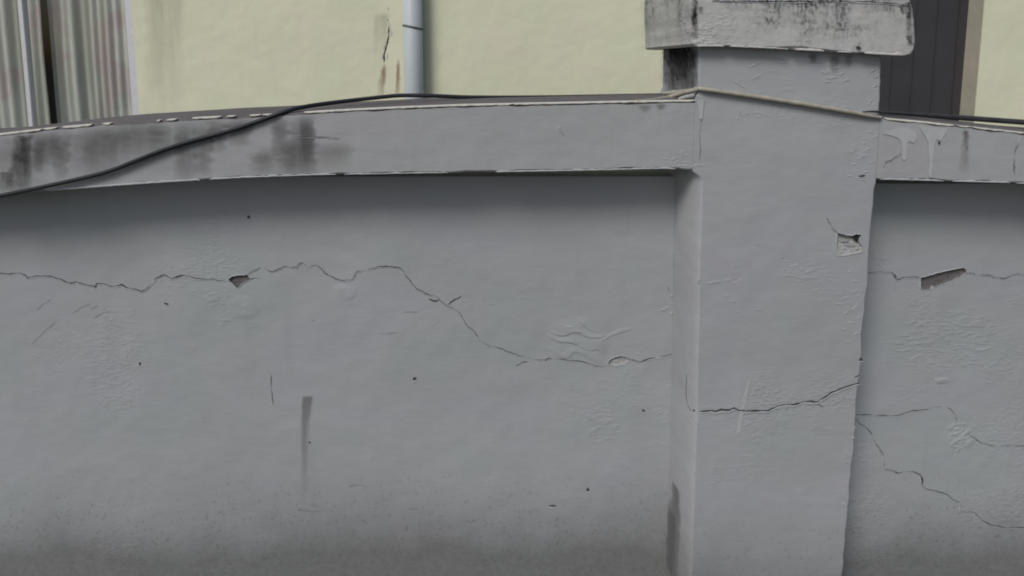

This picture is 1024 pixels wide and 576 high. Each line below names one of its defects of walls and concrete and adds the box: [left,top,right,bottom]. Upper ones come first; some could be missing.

spalling [836,233,863,256]
crack [0,273,224,293]
spalling [229,274,250,288]
crack [868,271,921,281]
spalling [920,267,967,290]
crack [966,272,1024,280]
crack [248,263,672,367]
crack [686,377,859,415]
crack [855,406,1024,529]